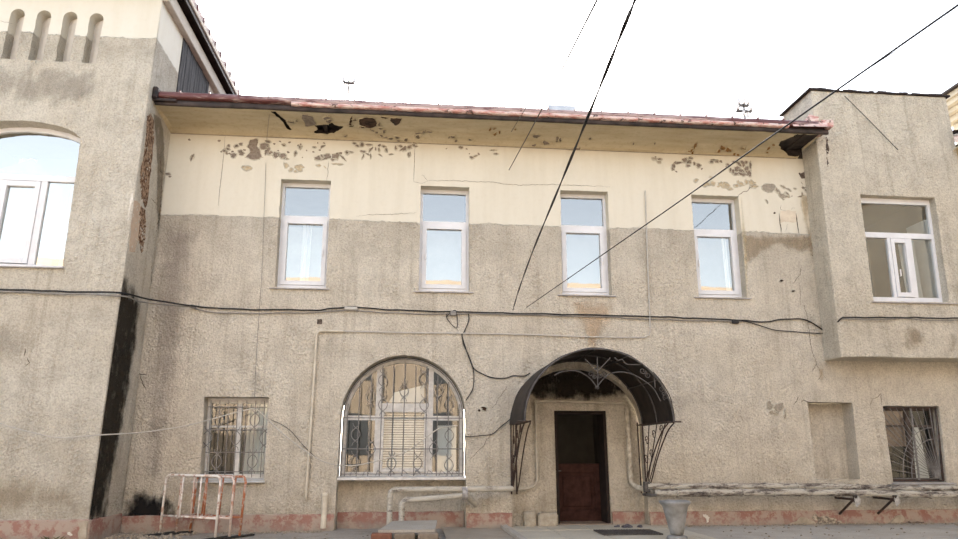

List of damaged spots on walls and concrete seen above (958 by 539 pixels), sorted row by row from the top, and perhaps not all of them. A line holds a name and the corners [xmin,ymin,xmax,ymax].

flaking render [138,114,154,253]
peeling [218,116,433,173]
peeling [446,135,499,160]
peeling [651,142,807,204]
water stain [89,280,139,520]